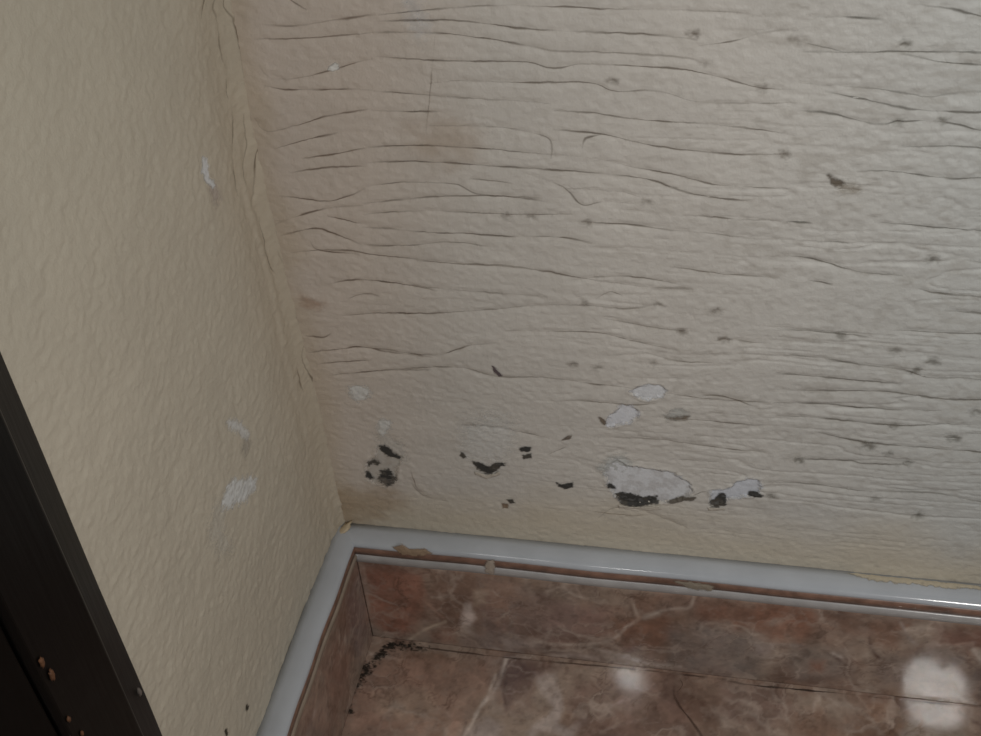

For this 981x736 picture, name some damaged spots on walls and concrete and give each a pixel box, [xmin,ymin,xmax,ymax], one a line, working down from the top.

crack [402,11,545,83]
crack [626,65,701,73]
crack [950,111,981,129]
crack [301,196,393,257]
crack [466,195,510,237]
peeling [599,384,667,427]
crack [810,361,903,461]
crack [901,371,981,400]
spalling [366,419,405,487]
peeling [460,452,505,479]
peeling [598,457,696,515]
peeling [708,479,763,511]